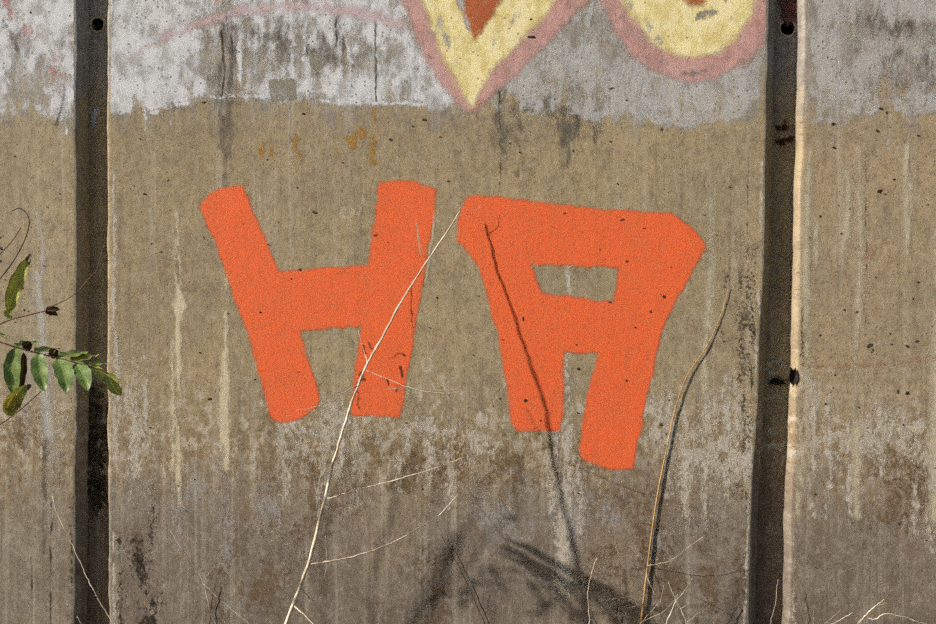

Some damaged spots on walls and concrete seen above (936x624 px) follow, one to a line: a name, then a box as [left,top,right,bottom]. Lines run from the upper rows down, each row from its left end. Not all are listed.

leakage [273,400,382,516]
leakage [394,412,498,510]
leakage [546,355,586,596]
leakage [112,507,163,624]